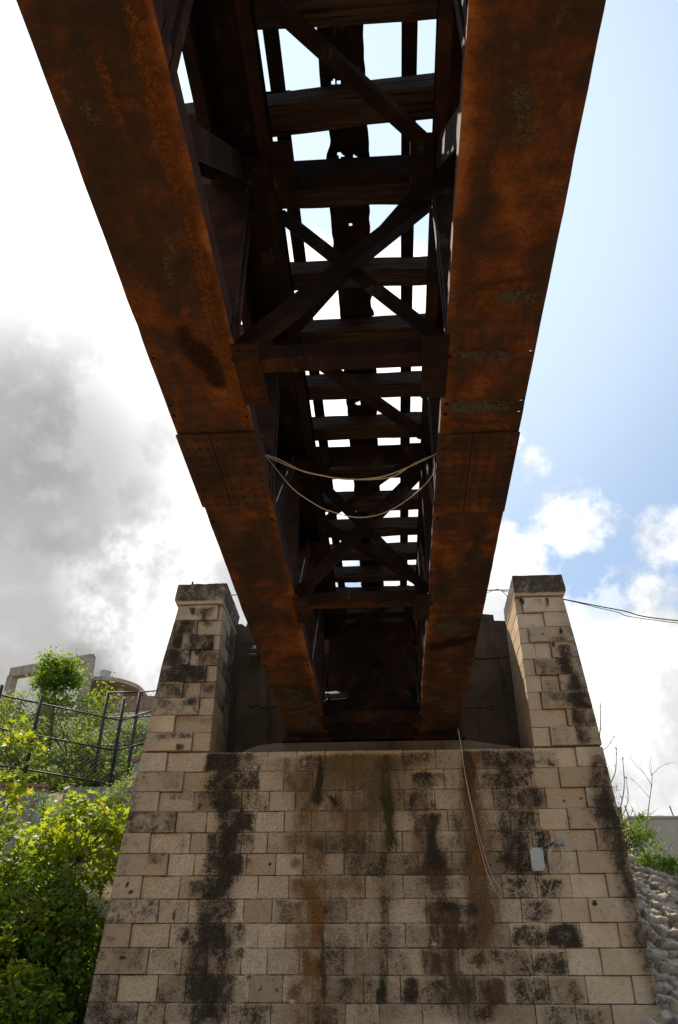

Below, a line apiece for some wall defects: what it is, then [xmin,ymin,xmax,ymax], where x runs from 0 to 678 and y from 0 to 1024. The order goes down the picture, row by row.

corrosion [177,327,227,389]
leakage [190,606,214,628]
leakage [143,752,270,1024]
corrosion [285,773,332,1024]
leakage [284,752,549,1023]
leakage [587,755,660,1005]